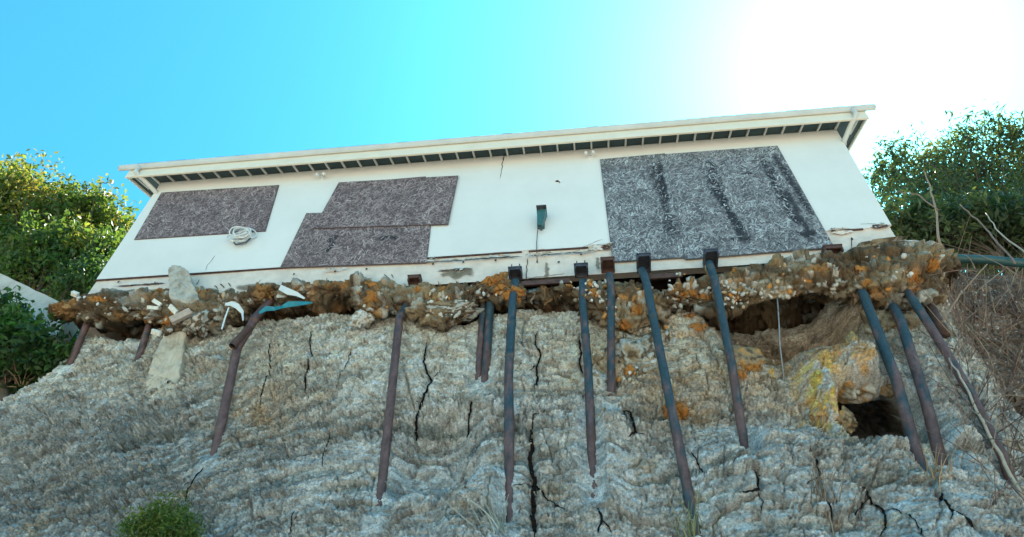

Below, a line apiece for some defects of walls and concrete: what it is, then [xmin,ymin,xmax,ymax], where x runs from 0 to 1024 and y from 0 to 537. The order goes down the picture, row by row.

flaking render [424,254,509,272]
flaking render [526,242,612,256]
rust [474,273,525,302]
crack [303,332,316,393]
crack [531,330,542,386]
rust [737,359,762,381]
crack [414,342,440,441]
crack [622,410,648,437]
rust [661,402,689,420]
crack [514,410,564,537]
crack [740,471,764,511]
crack [807,445,923,536]